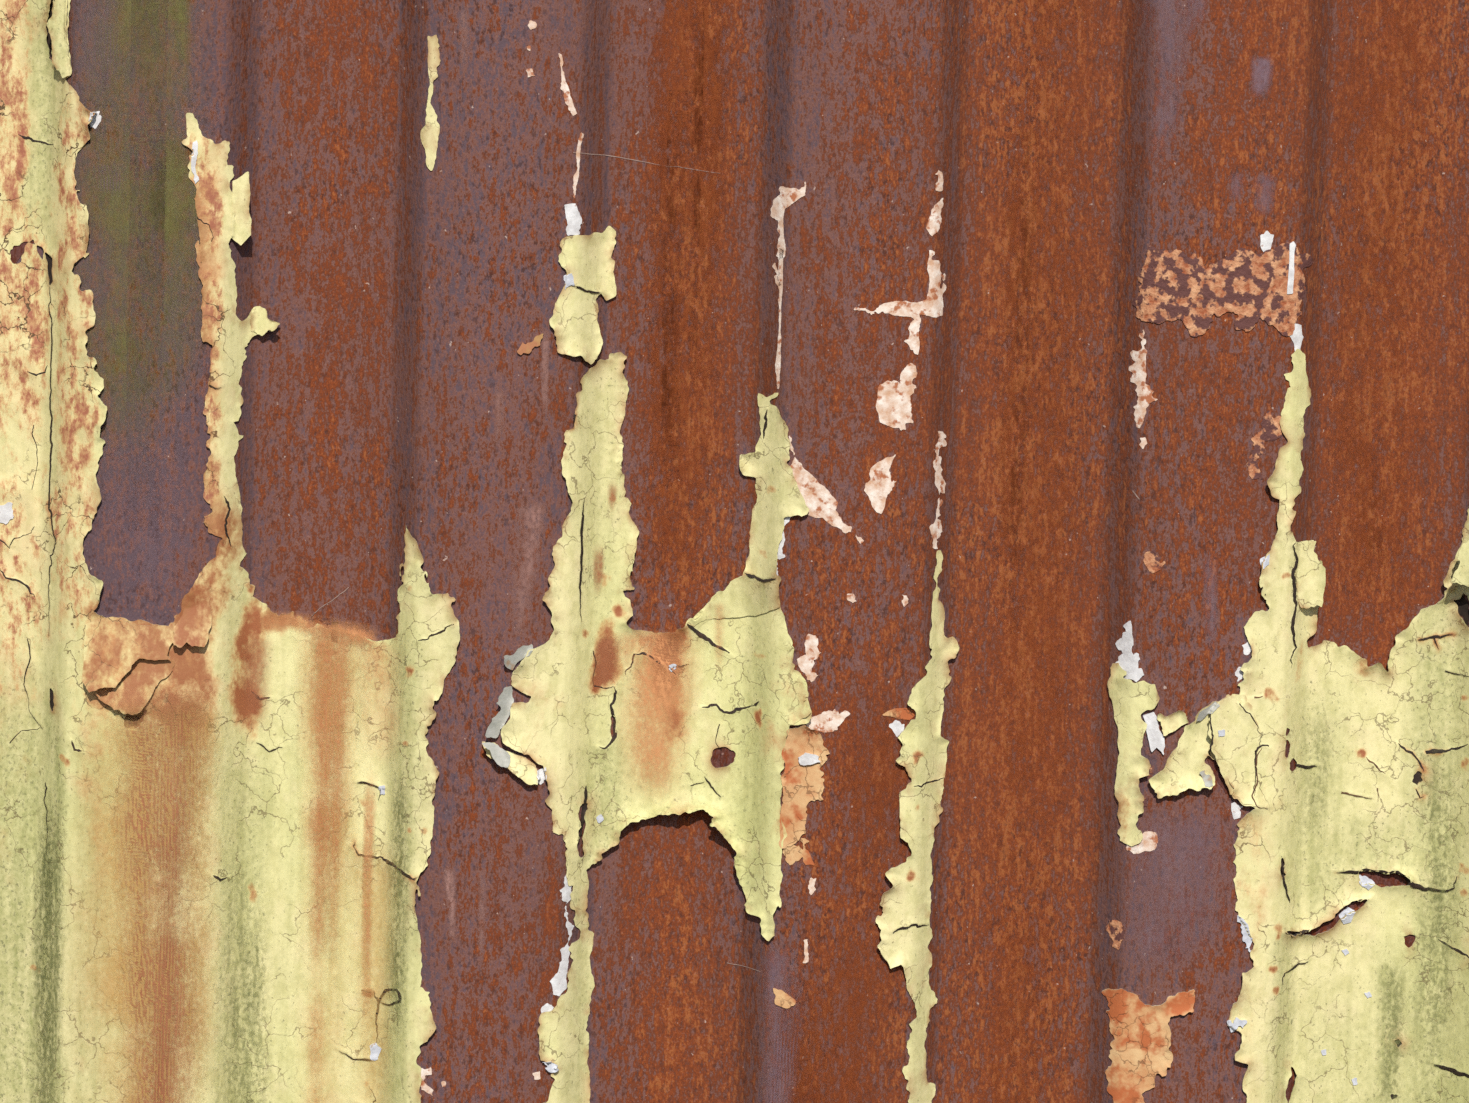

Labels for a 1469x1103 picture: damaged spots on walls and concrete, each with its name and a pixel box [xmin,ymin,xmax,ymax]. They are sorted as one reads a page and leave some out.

crack [0,282,81,752]
corrosion [101,715,208,1103]
peeling [0,0,460,1103]
corrosion [364,809,375,950]
corrosion [445,871,454,935]
crack [579,497,730,749]
peeling [482,226,830,1103]
corrosion [632,635,684,779]
peeling [875,498,959,1103]
peeling [1101,349,1469,1103]
crack [1291,542,1299,664]
crack [1281,856,1457,982]